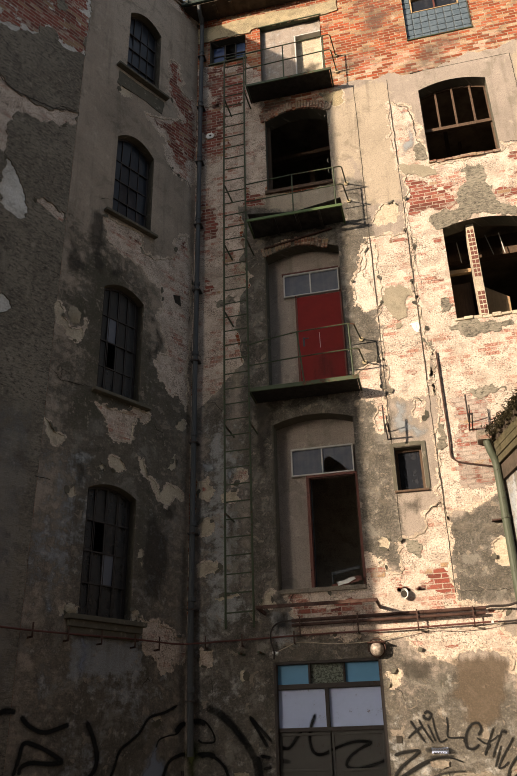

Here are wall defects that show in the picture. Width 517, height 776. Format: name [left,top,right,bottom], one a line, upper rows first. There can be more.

peeling [0,0,93,56]
peeling [319,88,346,107]
peeling [0,72,79,222]
peeling [103,57,267,432]
peeling [54,299,90,343]
peeling [259,100,517,675]
peeling [94,401,152,445]
peeling [138,456,185,510]
peeling [196,467,249,504]
water stain [144,519,167,597]
peeling [130,606,186,676]
peeling [197,647,214,669]